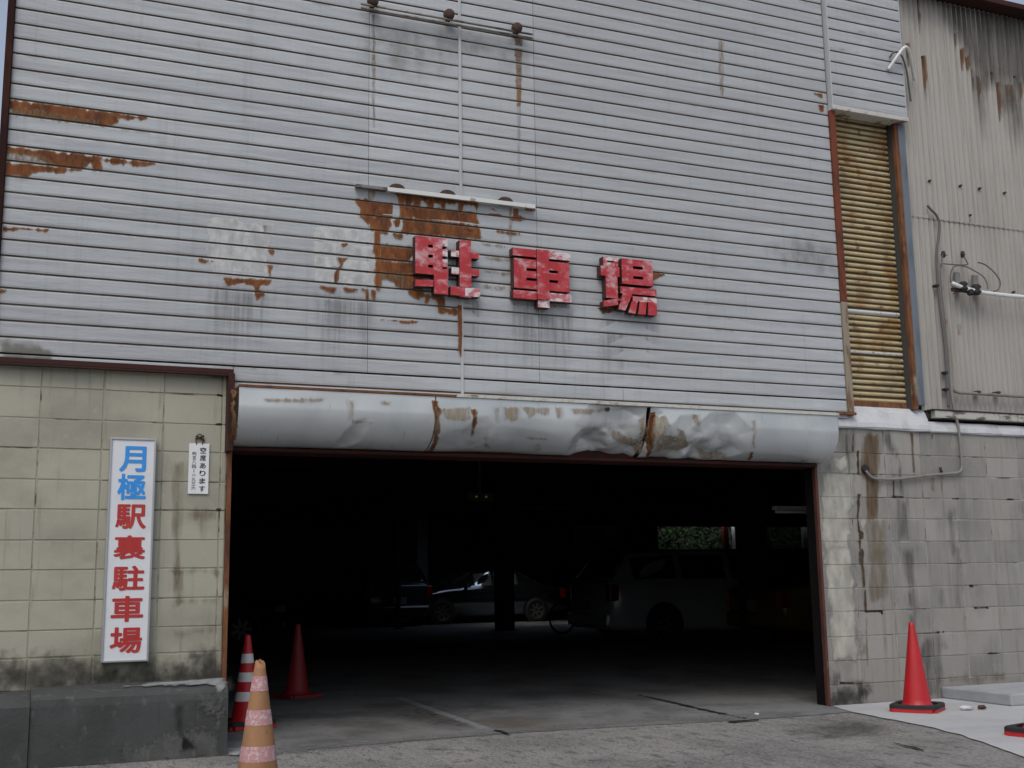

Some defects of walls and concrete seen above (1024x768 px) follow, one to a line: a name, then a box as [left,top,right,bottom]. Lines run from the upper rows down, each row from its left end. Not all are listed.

corrosion [954,34,981,102]
corrosion [9,100,147,127]
corrosion [996,82,1023,121]
corrosion [6,146,155,177]
corrosion [355,191,536,357]
corrosion [428,400,442,452]
leakage [861,433,893,599]